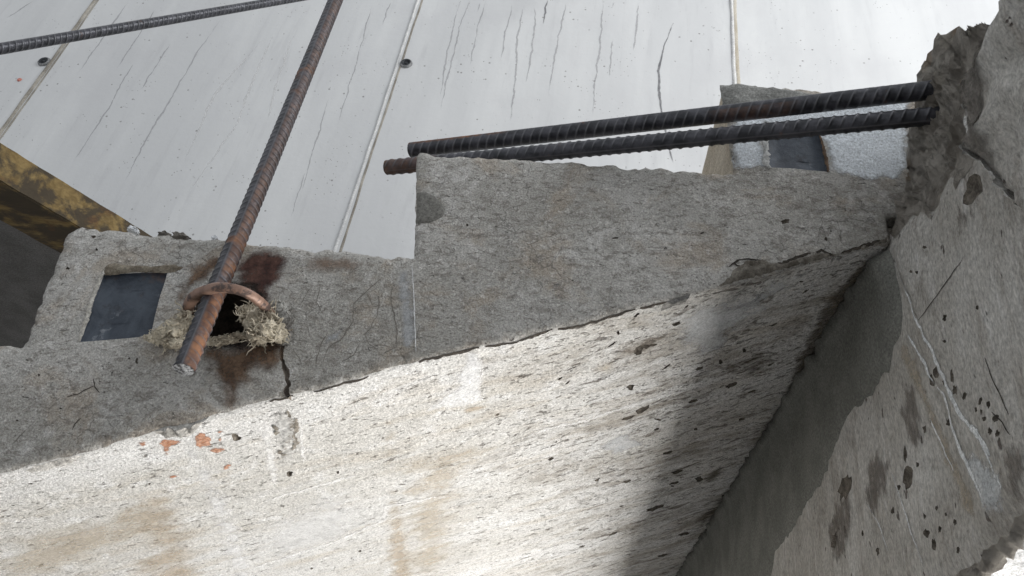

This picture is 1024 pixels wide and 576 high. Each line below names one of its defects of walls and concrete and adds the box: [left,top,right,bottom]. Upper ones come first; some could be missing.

crack [657,29,673,160]
spalling [953,158,983,205]
rust [188,257,218,285]
rust [238,252,285,302]
crack [270,277,398,402]
rust [206,342,279,404]